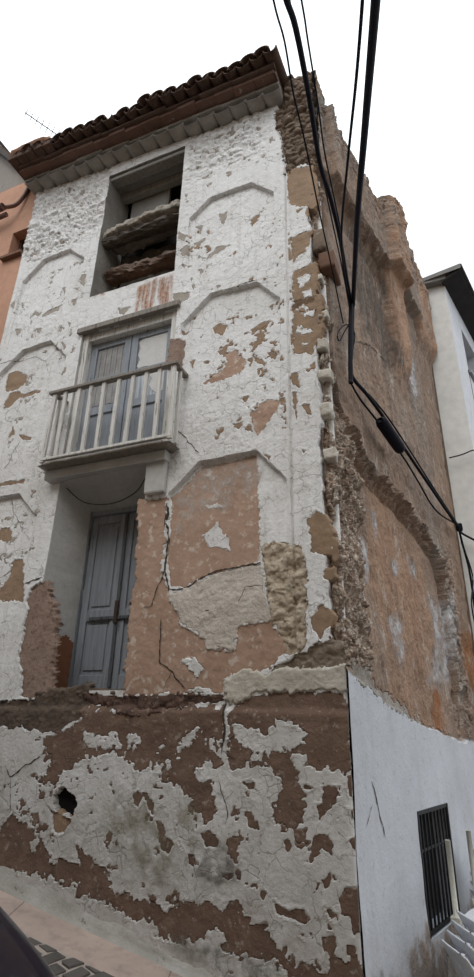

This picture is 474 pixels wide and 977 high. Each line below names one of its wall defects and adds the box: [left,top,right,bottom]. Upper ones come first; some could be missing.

peeling [25,178,104,262]
peeling [10,261,86,340]
peeling [4,371,41,409]
peeling [123,71,451,739]
peeling [0,471,45,543]
crack [143,503,263,690]
peeling [0,539,364,977]